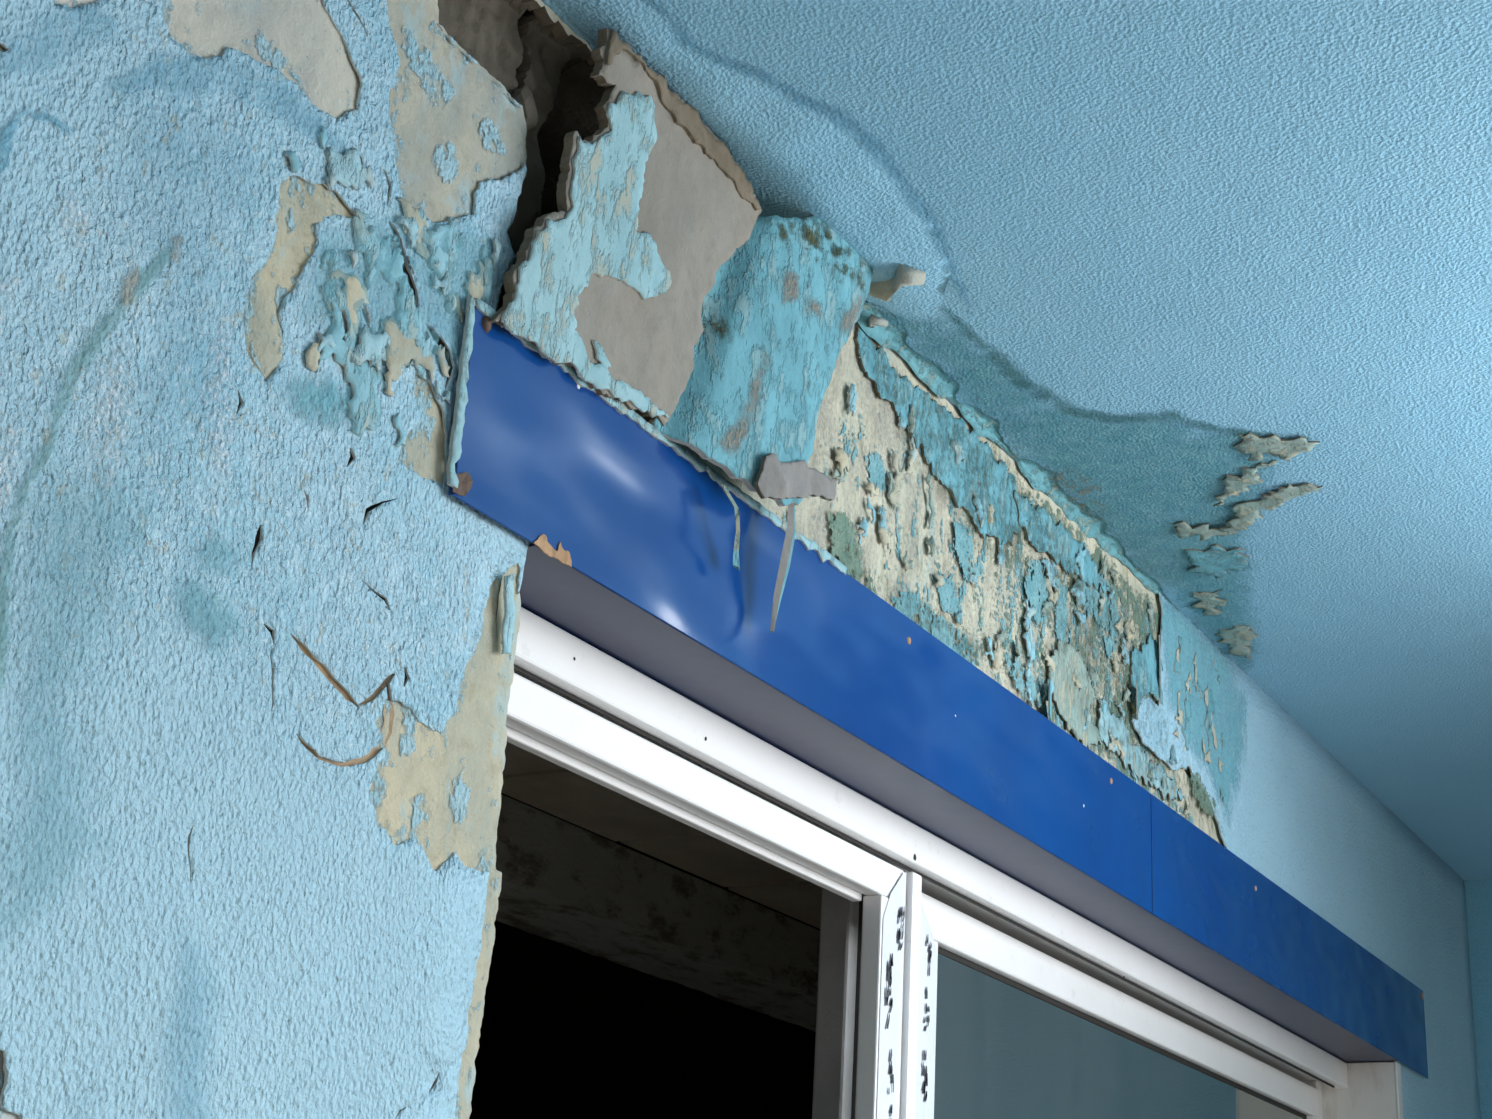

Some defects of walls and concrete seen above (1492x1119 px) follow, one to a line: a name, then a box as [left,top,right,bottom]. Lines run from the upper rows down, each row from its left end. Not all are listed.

peeling [54,0,98,9]
peeling [161,0,360,119]
leakage [678,29,966,298]
leakage [699,309,729,339]
peeling [242,0,1322,847]
leakage [884,310,1293,821]
peeling [0,1051,19,1119]